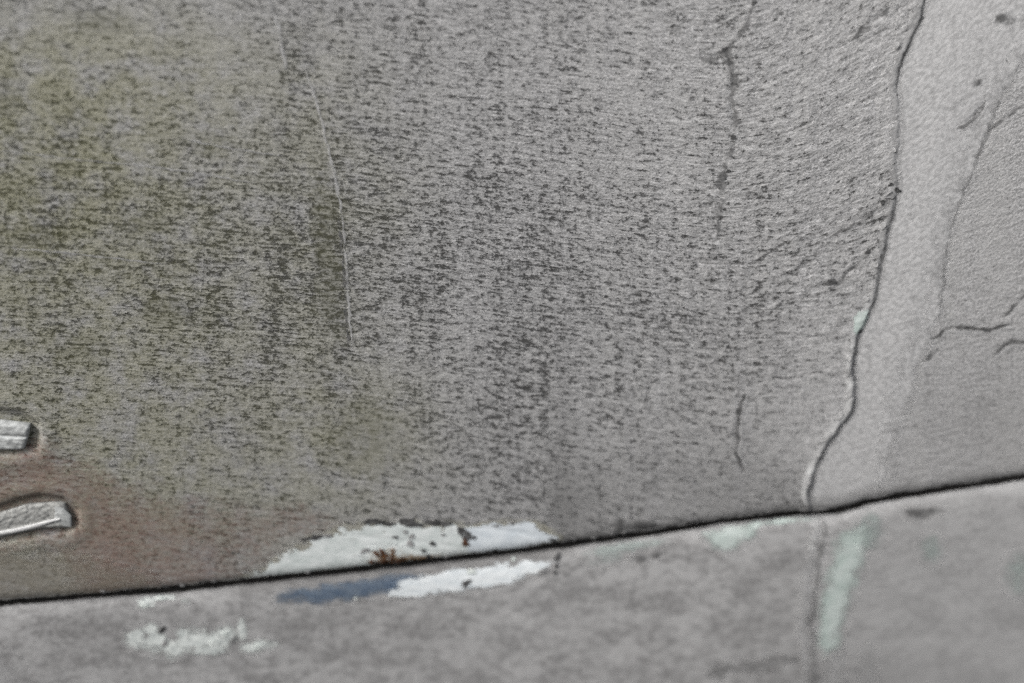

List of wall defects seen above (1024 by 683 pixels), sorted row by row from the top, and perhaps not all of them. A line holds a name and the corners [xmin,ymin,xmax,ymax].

crack [701,0,757,237]
crack [798,0,925,669]
crack [927,296,1024,360]
corrosion [367,548,426,564]
peeling [238,518,562,604]